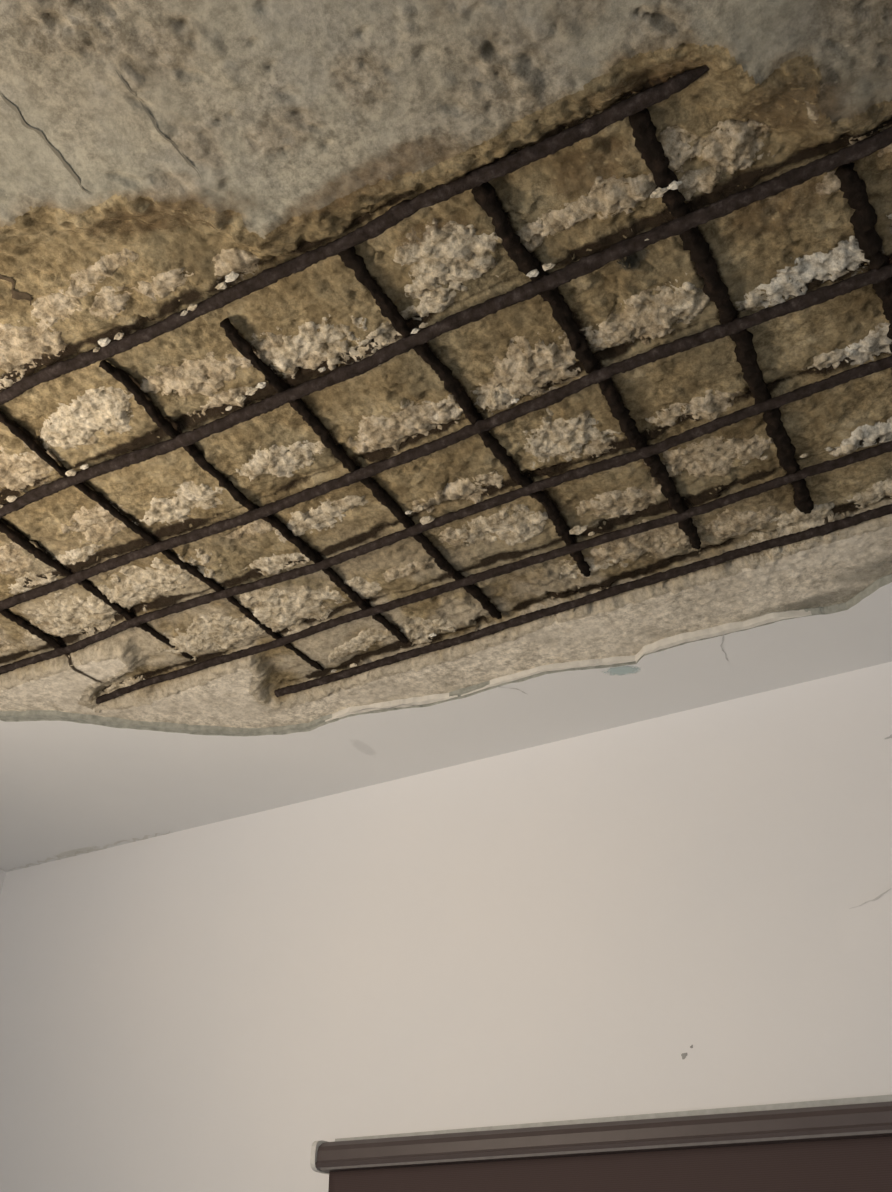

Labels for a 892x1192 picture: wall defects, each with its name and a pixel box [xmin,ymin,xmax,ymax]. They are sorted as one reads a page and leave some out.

crack [0,93,91,195]
crack [116,71,201,178]
peeling [0,0,892,734]